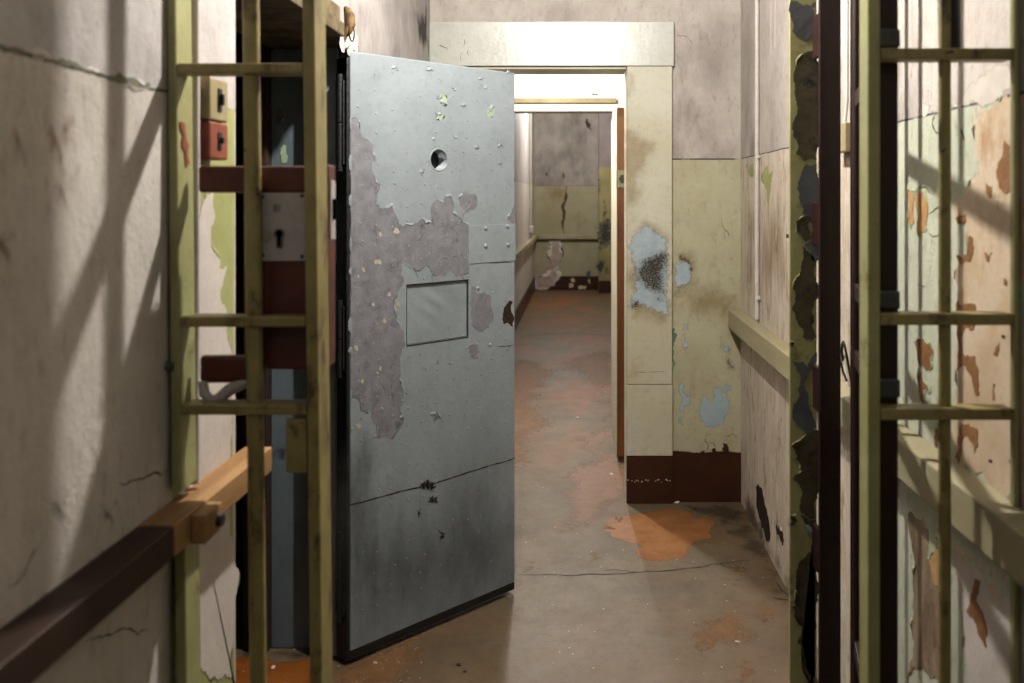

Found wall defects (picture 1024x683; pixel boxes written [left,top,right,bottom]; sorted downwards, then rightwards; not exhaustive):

peeling [200,193,227,314]
peeling [200,327,232,359]
peeling [200,379,235,399]
peeling [348,117,478,439]
crack [546,172,568,257]
peeling [756,1,818,683]
peeling [906,184,928,237]
peeling [913,336,934,404]
peeling [952,93,1024,505]
peeling [179,415,233,495]
peeling [199,508,240,683]
peeling [907,511,938,683]